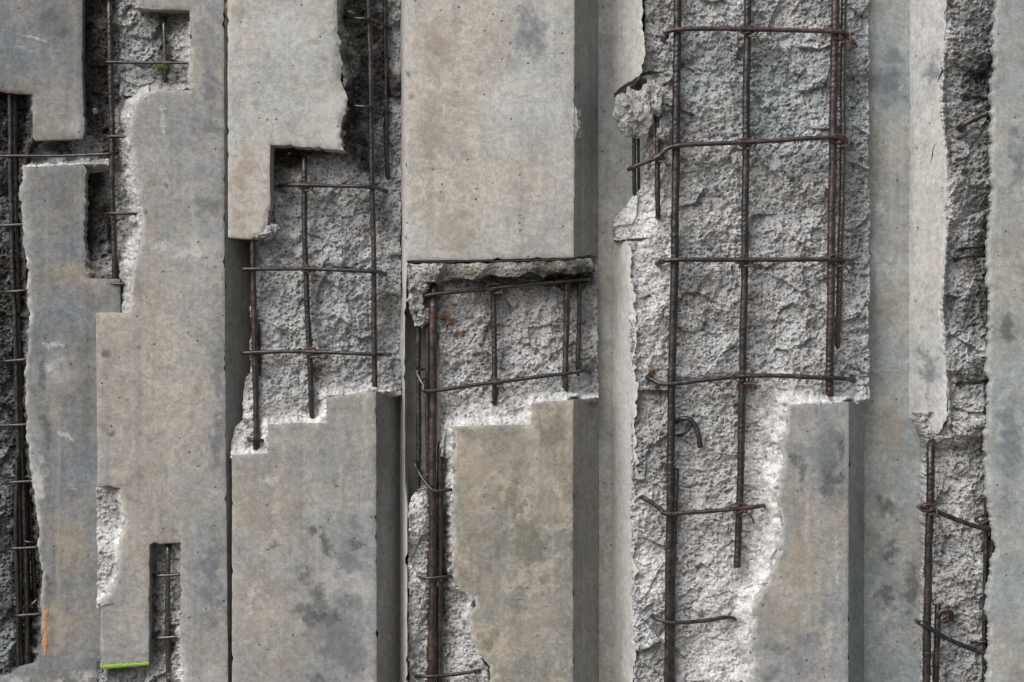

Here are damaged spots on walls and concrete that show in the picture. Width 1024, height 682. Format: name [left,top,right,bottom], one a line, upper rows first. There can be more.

spalling [0,0,192,682]
spalling [230,0,599,682]
spalling [612,0,871,682]
spalling [912,0,995,682]